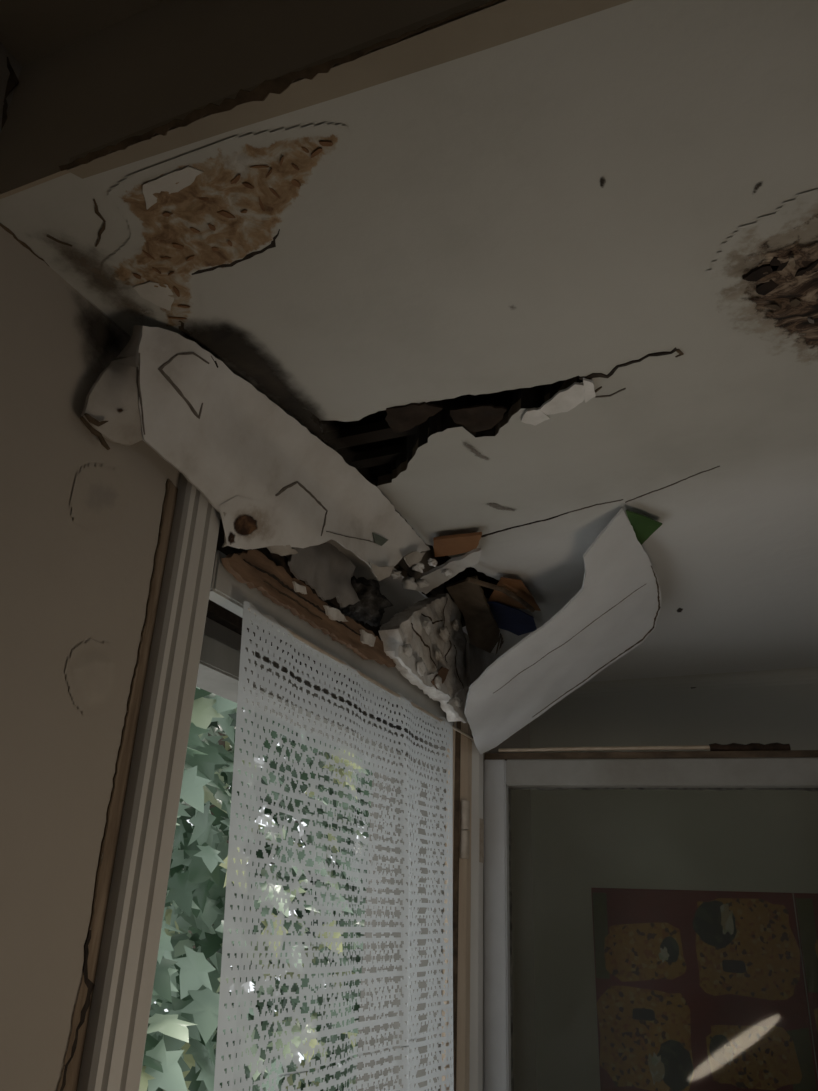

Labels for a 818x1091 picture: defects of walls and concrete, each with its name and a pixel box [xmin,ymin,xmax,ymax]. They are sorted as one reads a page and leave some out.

peeling [101,123,351,334]
spalling [706,189,818,371]
crack [578,347,684,398]
peeling [385,402,507,433]
peeling [521,378,596,426]
peeling [267,545,298,556]
peeling [370,551,426,581]
peeling [446,689,467,723]